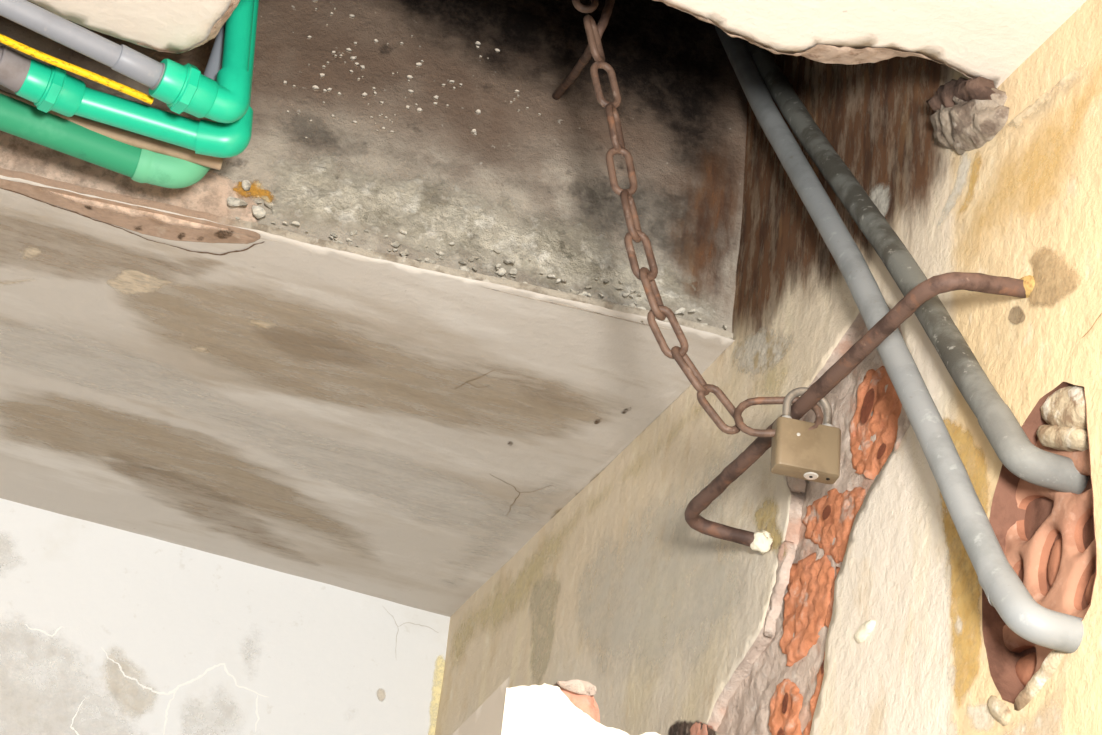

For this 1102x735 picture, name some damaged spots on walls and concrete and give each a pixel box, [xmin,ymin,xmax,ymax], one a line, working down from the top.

spalling [0,0,973,333]
damp [257,159,734,325]
corrosion [732,100,840,328]
corrosion [772,99,872,254]
corrosion [769,49,948,223]
damp [0,631,152,735]
damp [0,329,530,532]
damp [134,286,600,430]
flaking render [668,349,910,735]
spalling [943,420,1026,554]
peeling [940,492,1065,730]
spalling [1022,382,1097,621]